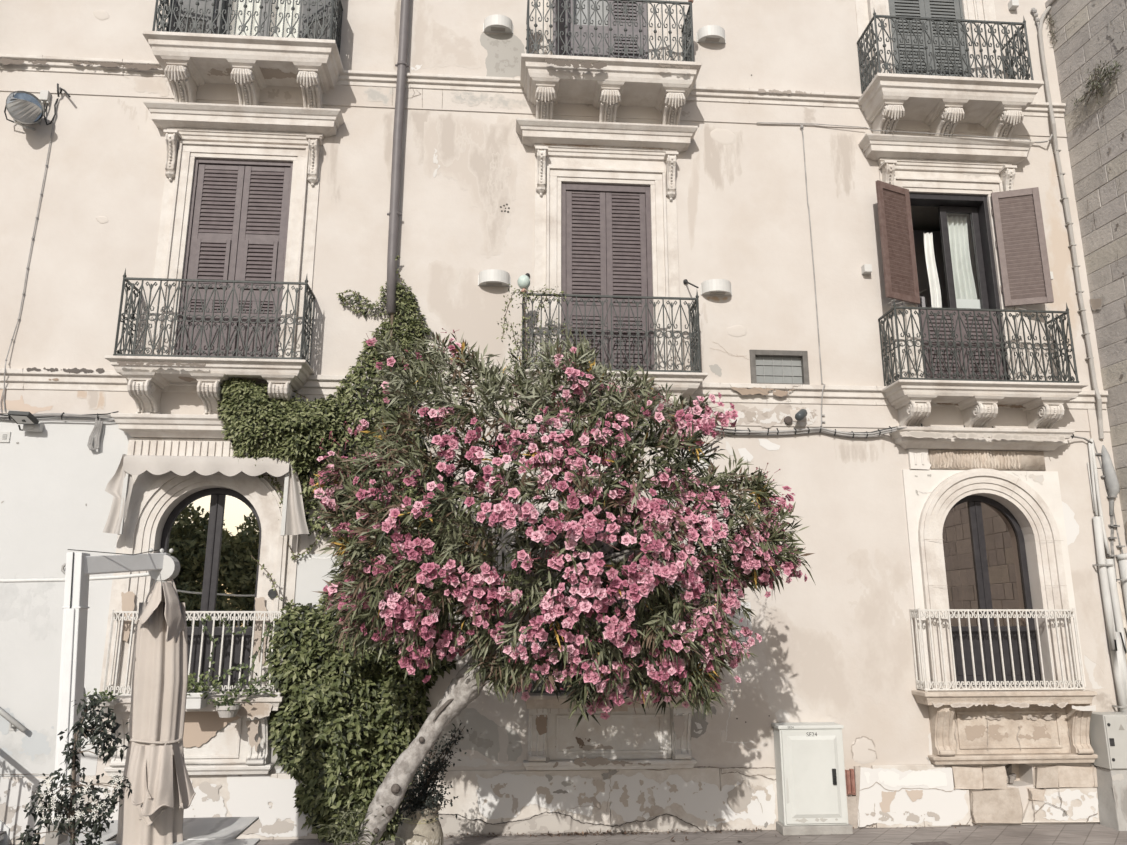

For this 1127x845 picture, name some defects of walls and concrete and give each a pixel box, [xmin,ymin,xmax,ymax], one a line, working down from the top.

peeling [0,779,51,841]
spalling [438,774,705,837]
peeling [706,782,771,822]
peeling [879,790,923,813]